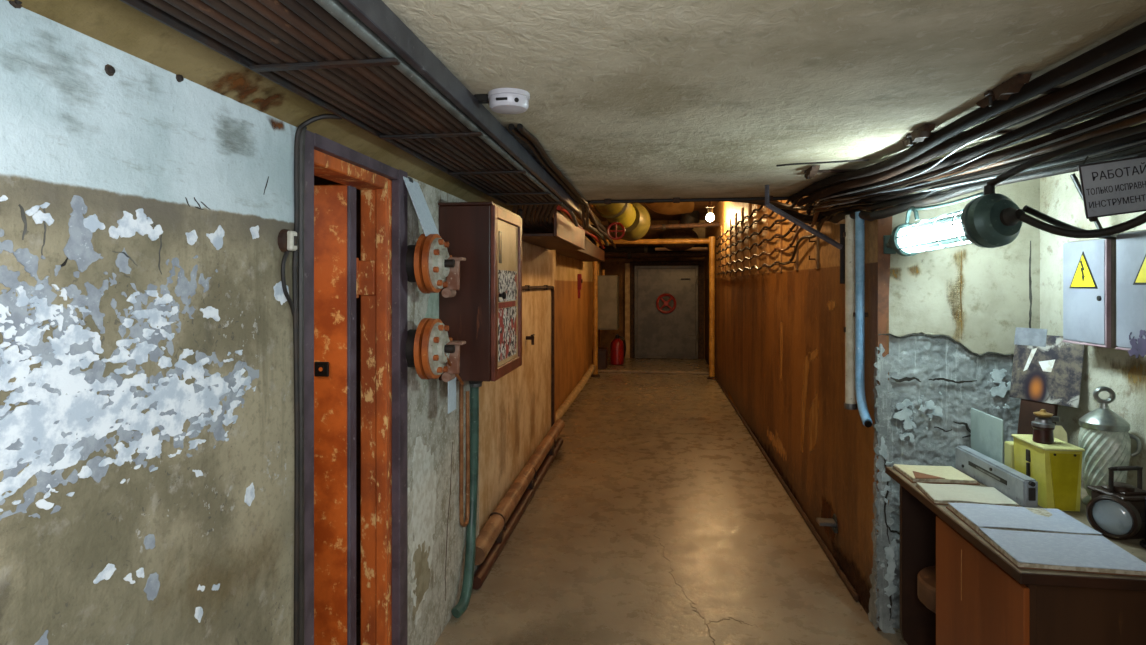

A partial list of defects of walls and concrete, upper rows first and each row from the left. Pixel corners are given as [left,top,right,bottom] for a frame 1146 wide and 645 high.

peeling [0,195,259,520]
peeling [144,534,155,549]
crack [655,533,755,645]
flaking render [868,333,1021,634]